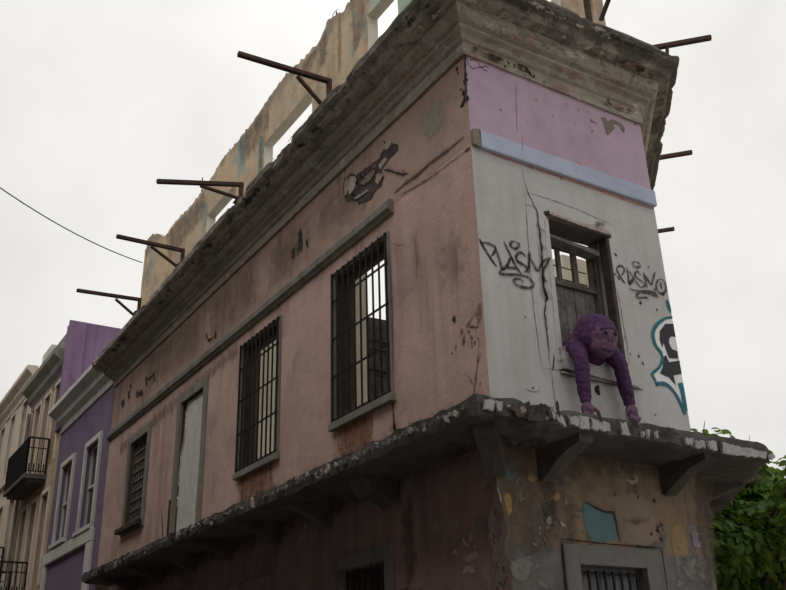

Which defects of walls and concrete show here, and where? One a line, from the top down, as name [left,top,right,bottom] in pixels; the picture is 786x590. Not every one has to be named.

spalling [456,55,490,107]
spalling [504,61,548,83]
peeling [577,108,625,135]
spalling [343,141,398,204]
crack [516,87,610,411]
spalling [84,408,464,576]
spalling [450,488,514,590]
flaking render [583,491,704,558]